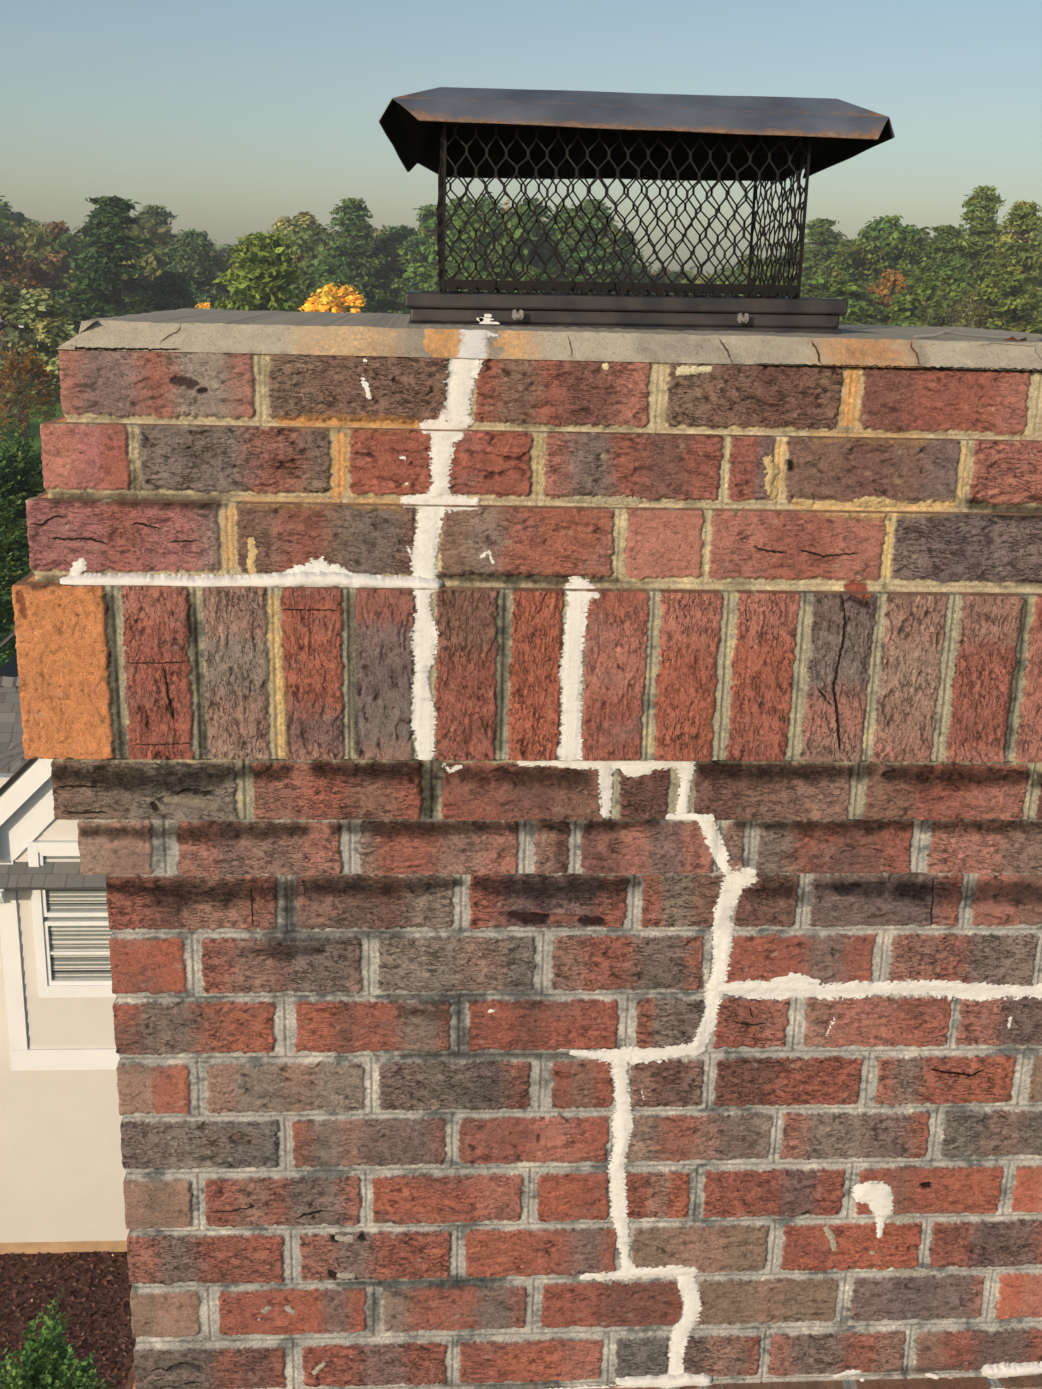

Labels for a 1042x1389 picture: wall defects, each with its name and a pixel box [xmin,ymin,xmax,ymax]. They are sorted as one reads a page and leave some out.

crack [70,323,182,351]
crack [33,515,197,545]
crack [282,605,337,613]
crack [816,597,846,752]
crack [125,661,193,746]
crack [56,785,107,814]
crack [928,879,936,924]
crack [734,1005,766,1026]
crack [929,1068,982,1077]
crack [214,1205,256,1213]
crack [294,1210,327,1220]
crack [148,1362,203,1388]